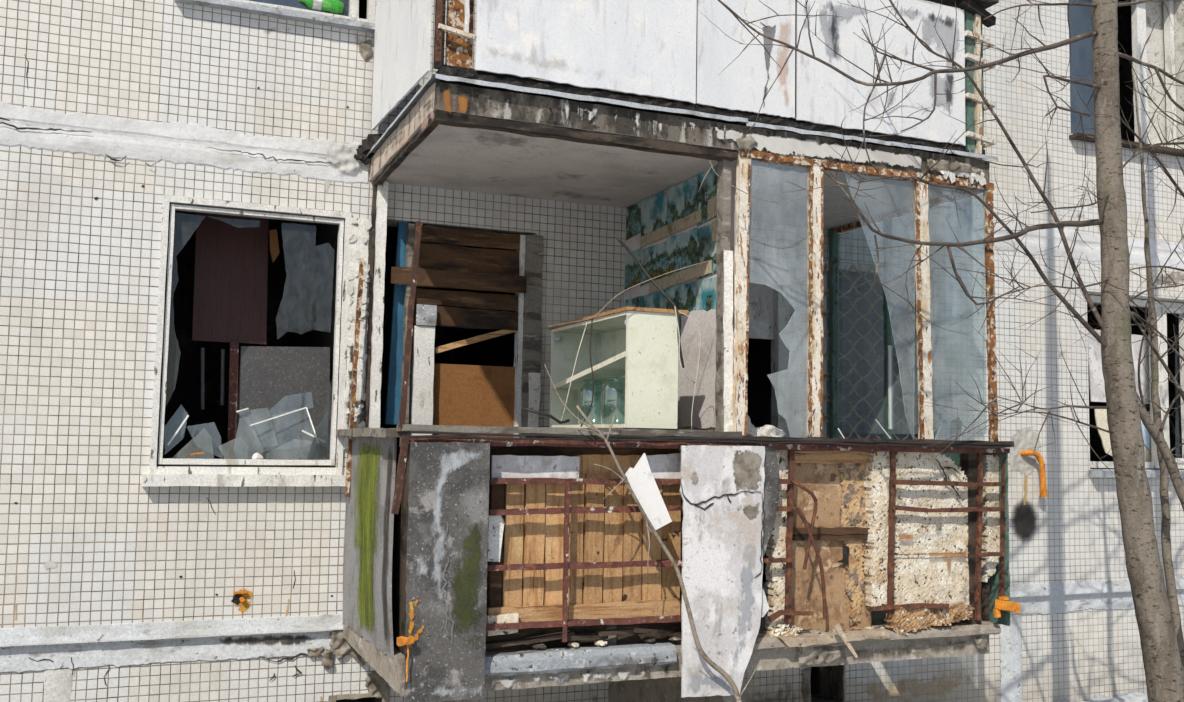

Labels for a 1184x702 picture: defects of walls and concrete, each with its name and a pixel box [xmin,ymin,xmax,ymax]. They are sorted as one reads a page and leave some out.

crack [0,117,89,132]
crack [209,147,335,165]
peeling [733,450,762,519]
leakage [354,442,392,640]
leakage [417,450,480,599]
crack [681,484,764,578]
spalling [307,630,390,698]
leakage [434,686,482,696]